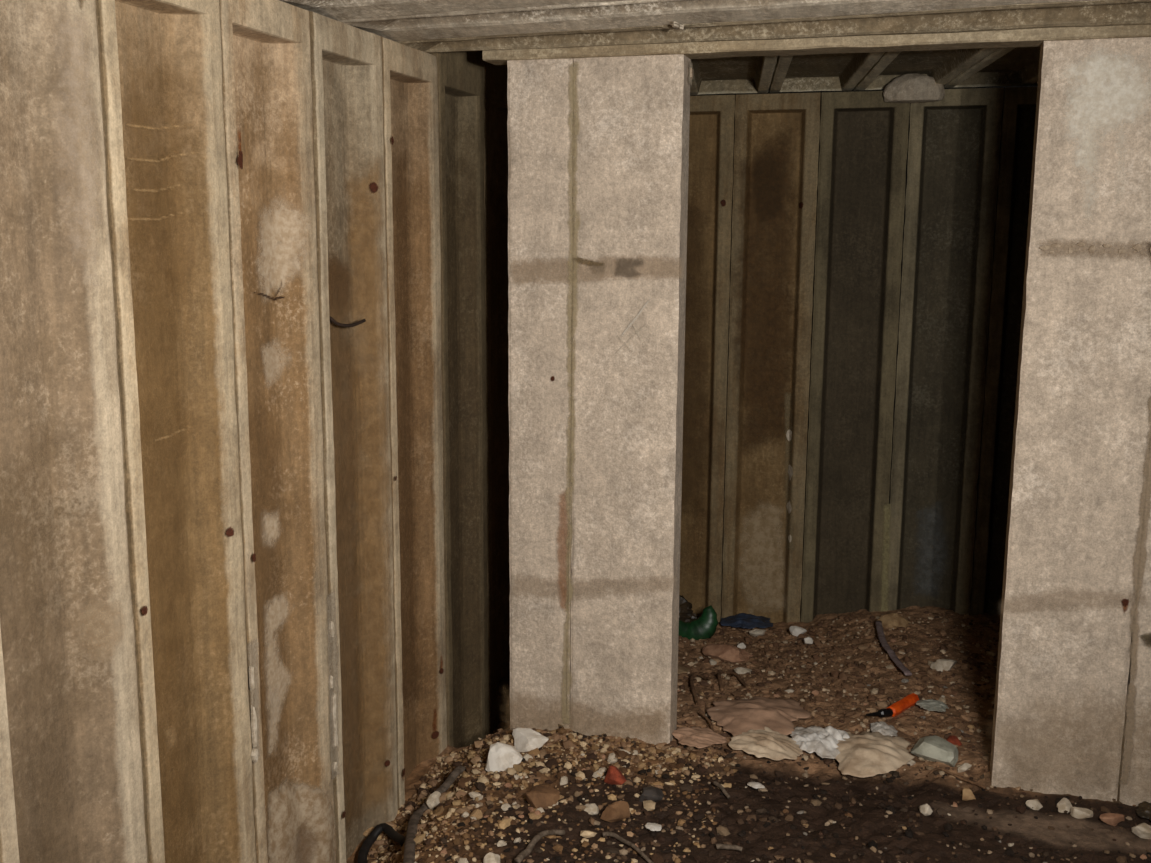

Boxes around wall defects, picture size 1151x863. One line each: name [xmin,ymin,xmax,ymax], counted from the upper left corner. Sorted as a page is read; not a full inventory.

water stain [258,203,310,297]
water stain [616,259,641,277]
water stain [738,143,790,443]
water stain [262,344,284,382]
water stain [264,515,279,542]
crack [1120,397,1151,784]
water stain [265,596,290,752]